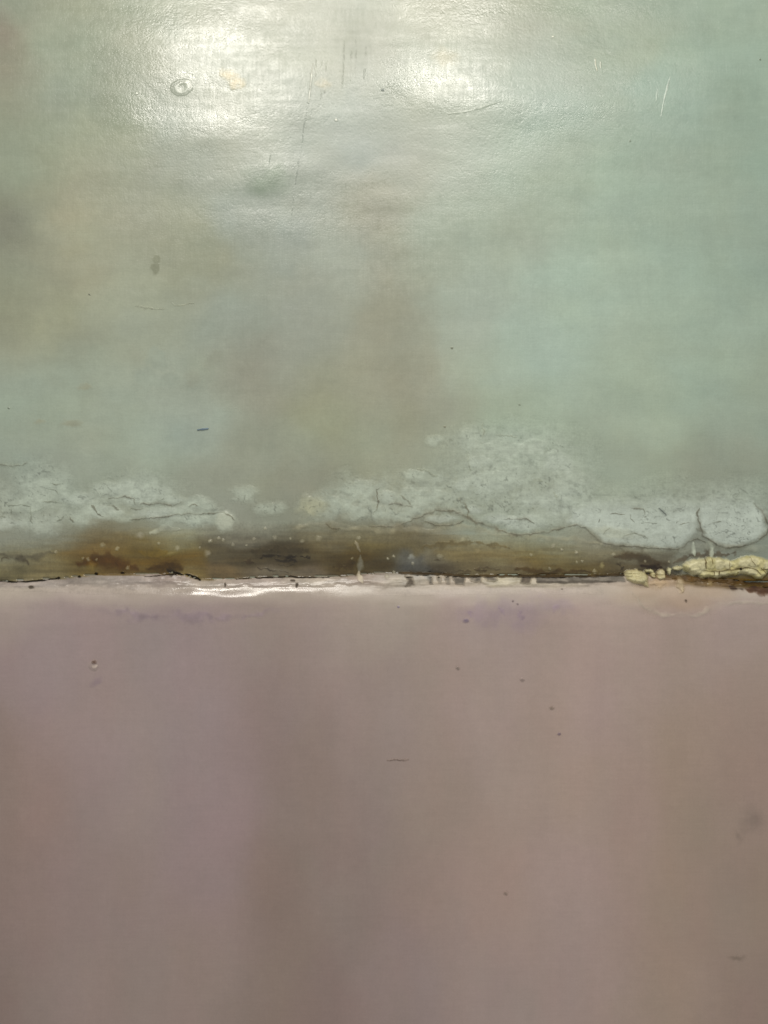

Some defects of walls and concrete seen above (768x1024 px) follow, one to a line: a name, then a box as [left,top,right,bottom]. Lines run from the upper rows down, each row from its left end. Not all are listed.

crack [0,482,235,524]
leakage [190,520,444,584]
crack [368,488,768,576]